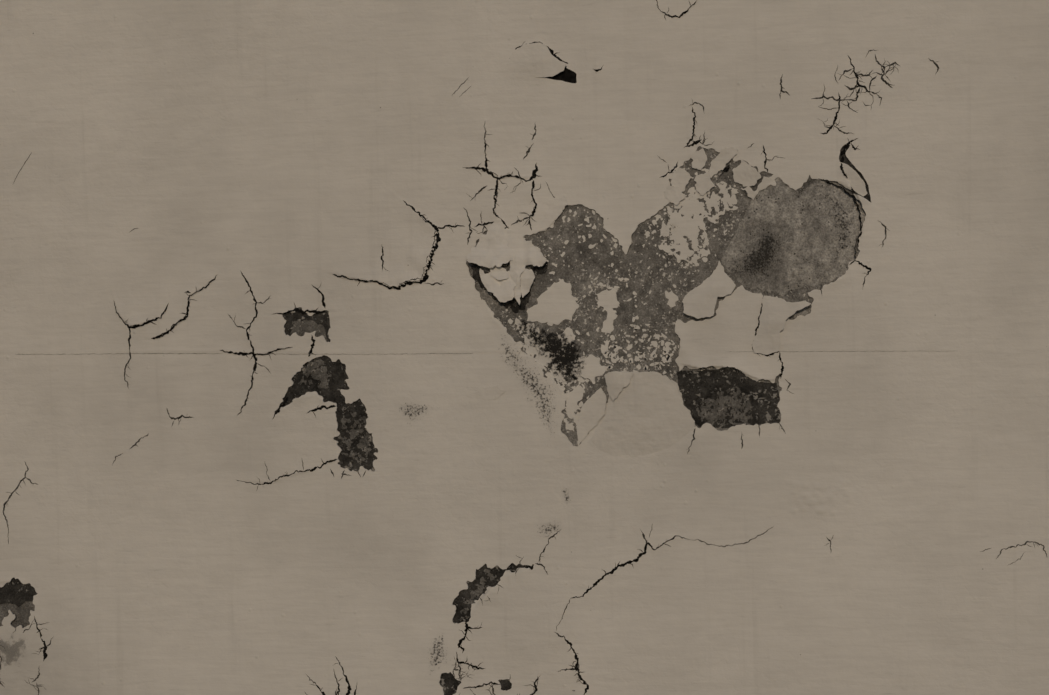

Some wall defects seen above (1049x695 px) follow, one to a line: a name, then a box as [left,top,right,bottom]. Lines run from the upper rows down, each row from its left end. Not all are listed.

crack [779,50,900,134]
crack [333,124,555,290]
crack [16,272,472,414]
spalling [237,284,378,491]
peeling [466,138,871,458]
spalling [0,578,51,695]
spalling [305,656,357,695]
spalling [453,531,559,670]
crack [440,527,773,695]